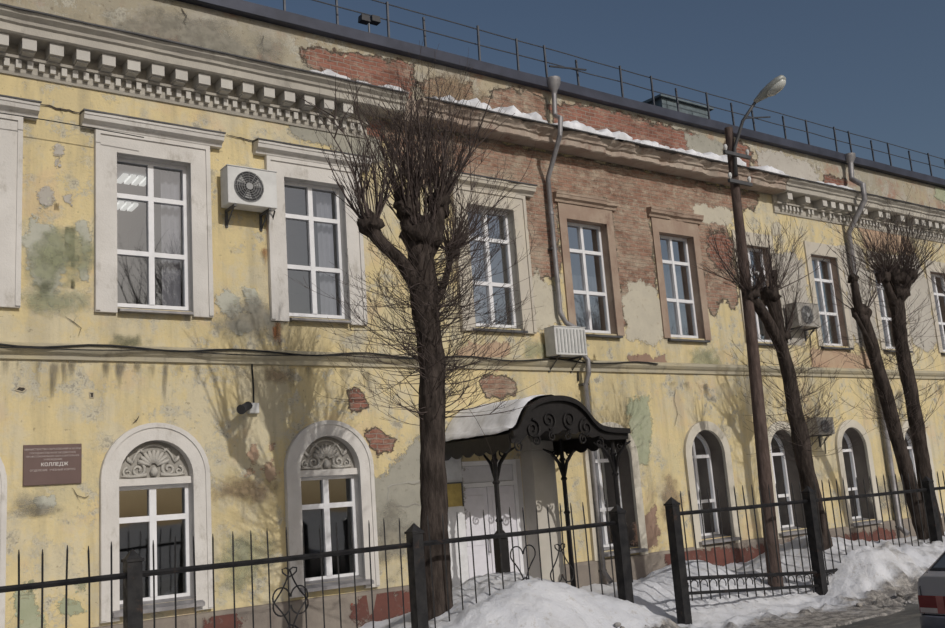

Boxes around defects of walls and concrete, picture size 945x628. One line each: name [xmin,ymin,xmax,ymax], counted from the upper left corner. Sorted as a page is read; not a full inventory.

spalling [299,43,848,186]
spalling [287,118,760,362]
leakage [217,297,283,336]
spalling [346,386,369,413]
spalling [479,370,518,399]
spalling [363,426,398,458]
peeling [203,613,246,628]